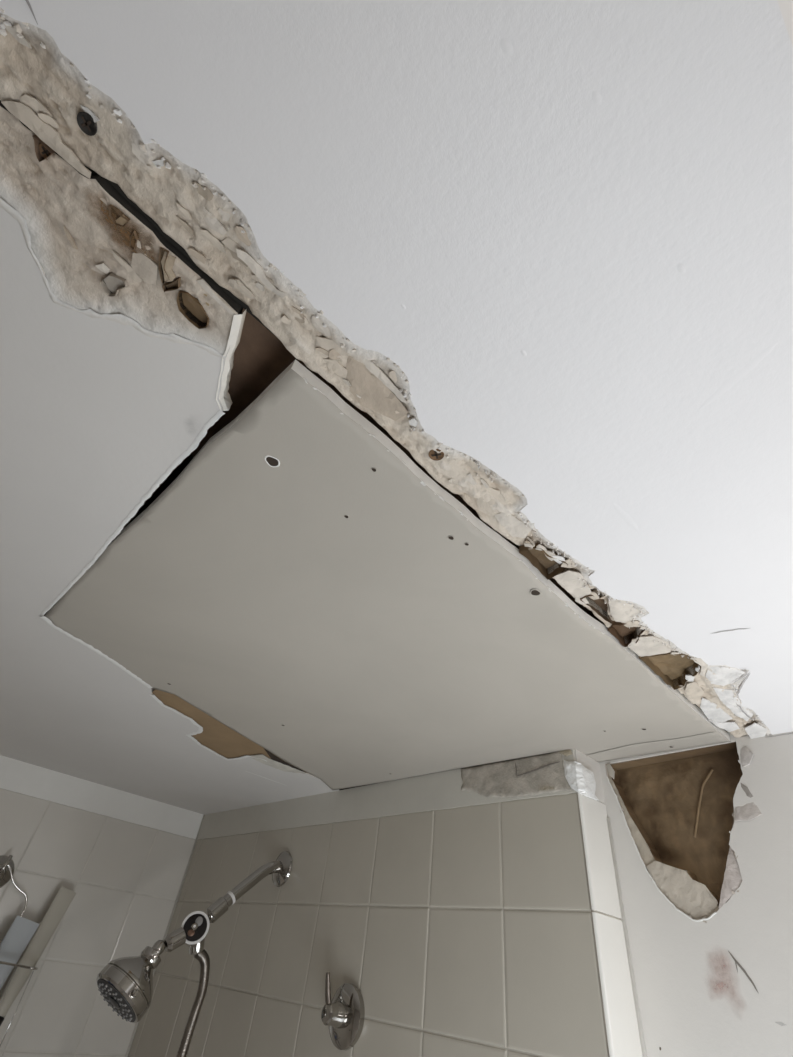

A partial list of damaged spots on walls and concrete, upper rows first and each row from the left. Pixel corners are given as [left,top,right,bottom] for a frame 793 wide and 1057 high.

peeling [0,7,771,739]
peeling [250,754,307,774]
flaking render [461,749,599,800]
spalling [606,742,762,923]